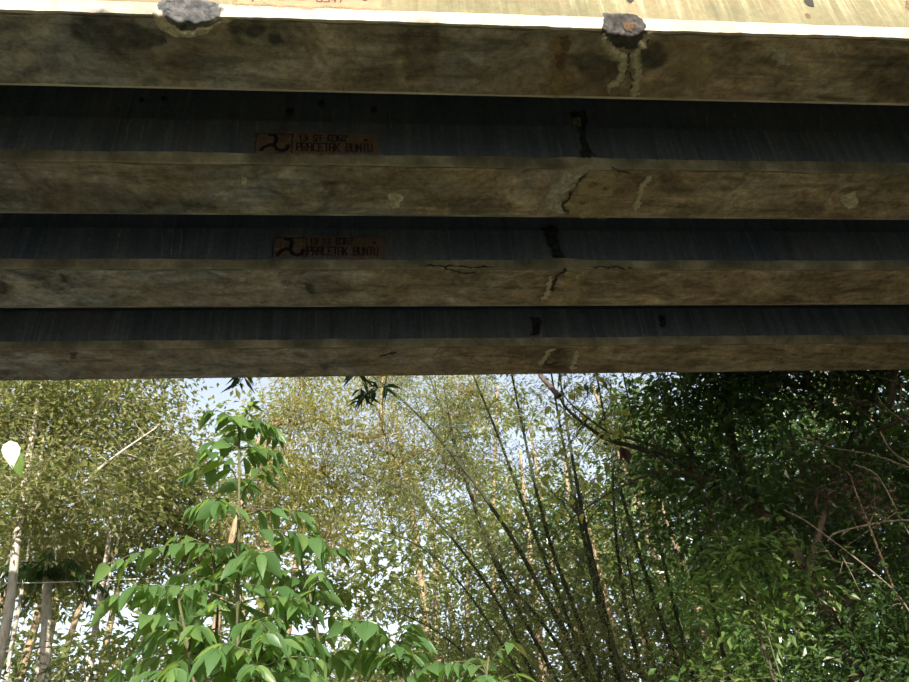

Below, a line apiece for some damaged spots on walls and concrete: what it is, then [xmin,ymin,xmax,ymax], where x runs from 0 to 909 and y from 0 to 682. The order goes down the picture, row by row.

spalling [152,0,230,38]
crack [561,173,587,213]
crack [425,264,490,274]
crack [551,268,567,293]